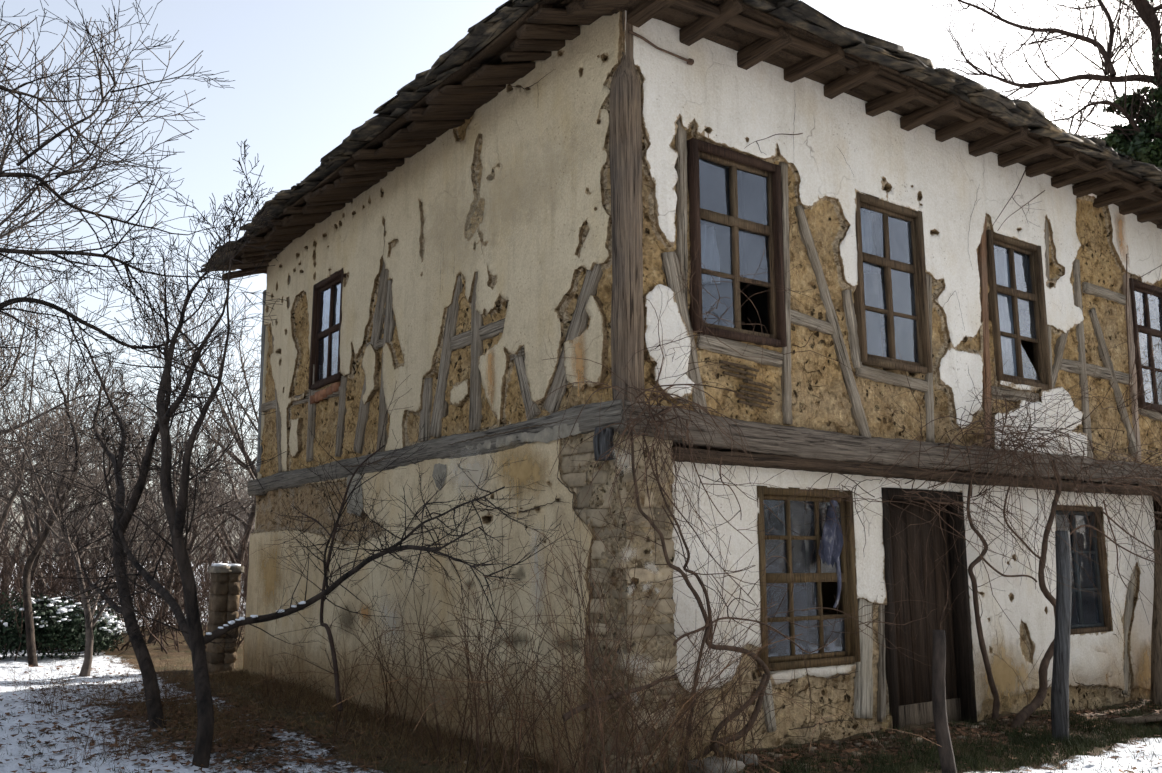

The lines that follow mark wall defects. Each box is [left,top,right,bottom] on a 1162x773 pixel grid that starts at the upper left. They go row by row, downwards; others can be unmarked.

spalling [456,112,494,239]
spalling [404,141,613,446]
spalling [641,121,1162,466]
spalling [259,276,404,478]
spalling [253,480,384,545]
spalling [675,603,889,762]
spalling [1020,623,1031,661]